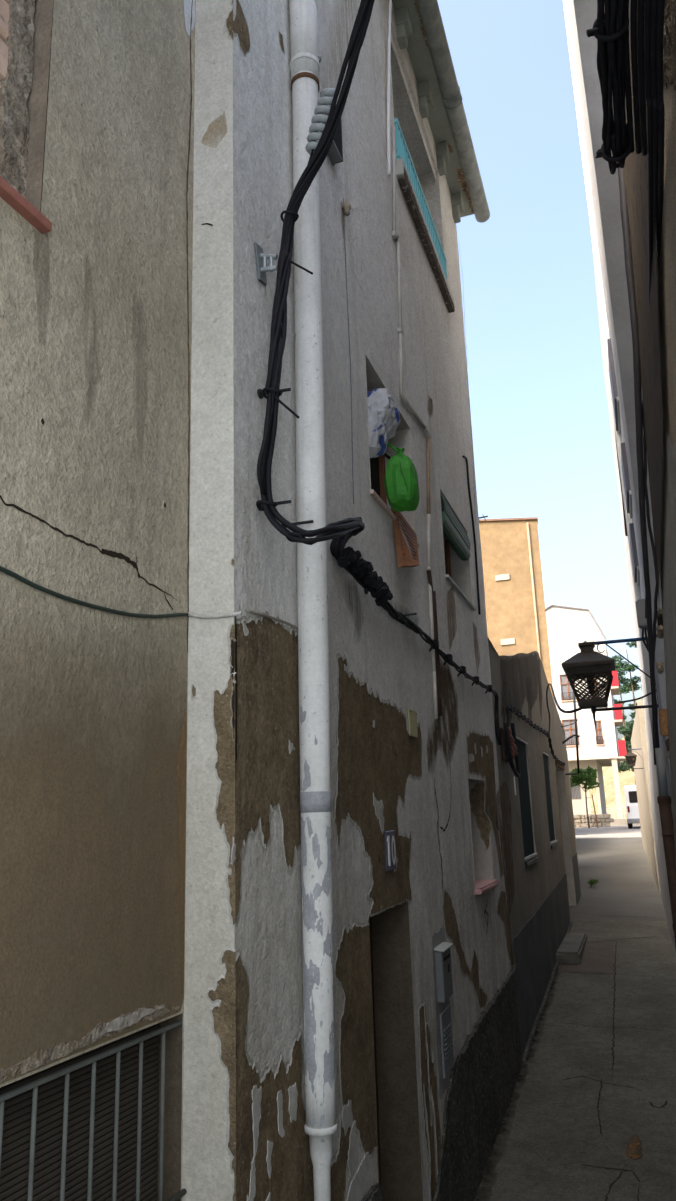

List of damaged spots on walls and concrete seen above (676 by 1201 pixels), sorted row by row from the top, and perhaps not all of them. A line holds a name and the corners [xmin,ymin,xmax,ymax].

peeling [184,0,195,36]
peeling [224,0,250,57]
crack [0,0,213,652]
peeling [191,611,422,1201]
peeling [442,885,488,1010]
peeling [466,729,515,967]
crack [563,916,667,1137]
crack [582,1164,640,1201]